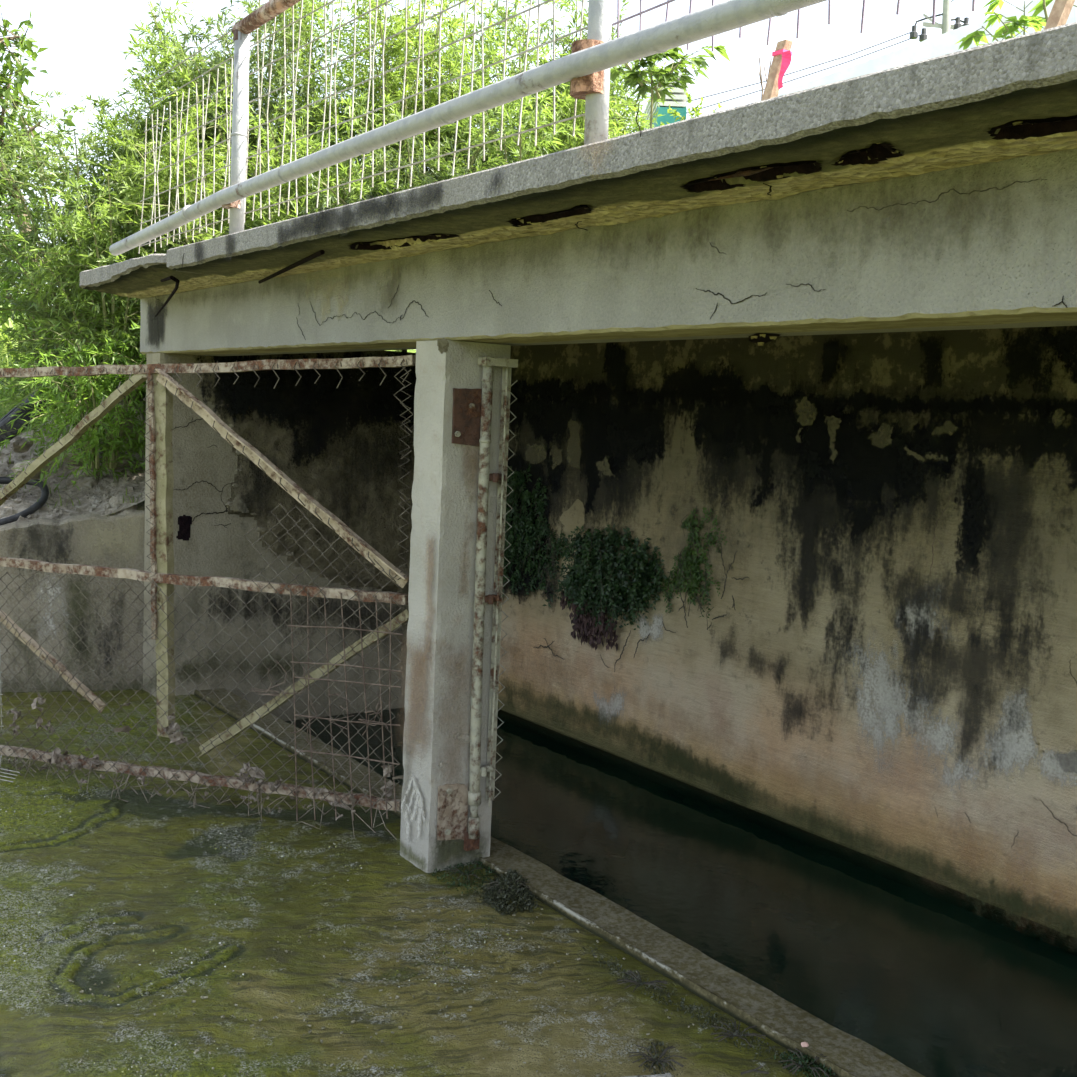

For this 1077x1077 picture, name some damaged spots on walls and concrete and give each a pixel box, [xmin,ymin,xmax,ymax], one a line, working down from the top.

spalling [987,115,1077,140]
spalling [680,143,904,193]
spalling [506,205,592,227]
crack [847,179,1047,212]
crack [296,285,427,340]
crack [696,283,826,319]
crack [174,481,234,529]
leakage [502,326,1077,786]